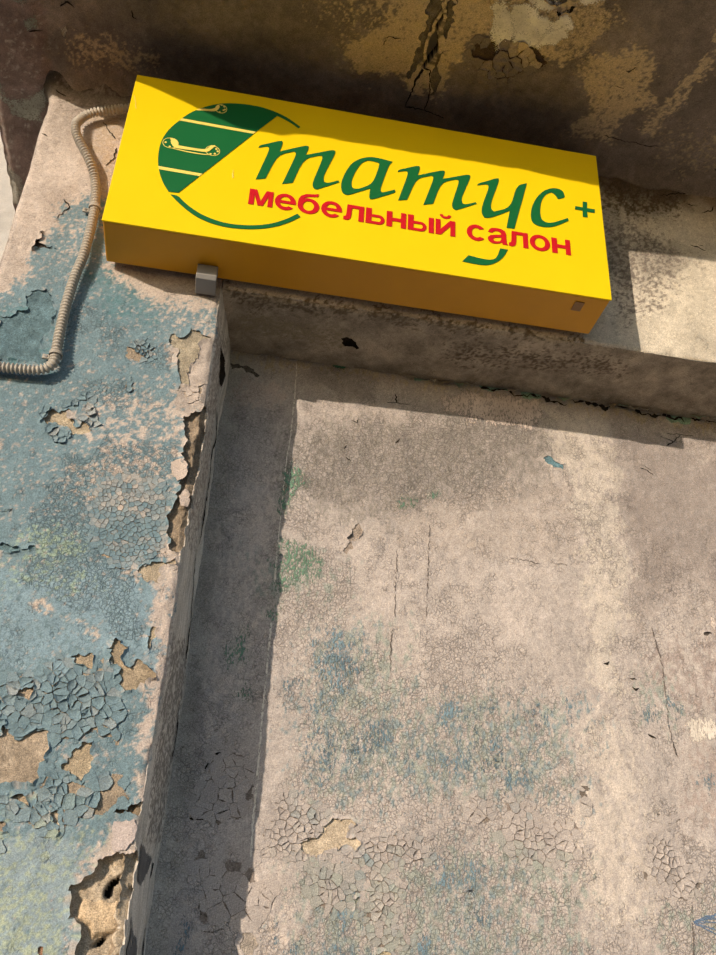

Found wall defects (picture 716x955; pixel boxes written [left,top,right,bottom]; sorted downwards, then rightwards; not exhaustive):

crack [405,49,443,118]
peeling [461,34,547,87]
leakage [489,0,575,52]
peeling [29,230,58,253]
peeling [0,287,59,366]
peeling [37,391,101,443]
peeling [85,326,262,588]
crack [186,417,218,658]
peeling [0,623,161,955]
crack [184,732,437,952]
crack [463,782,592,876]
crack [638,812,716,955]